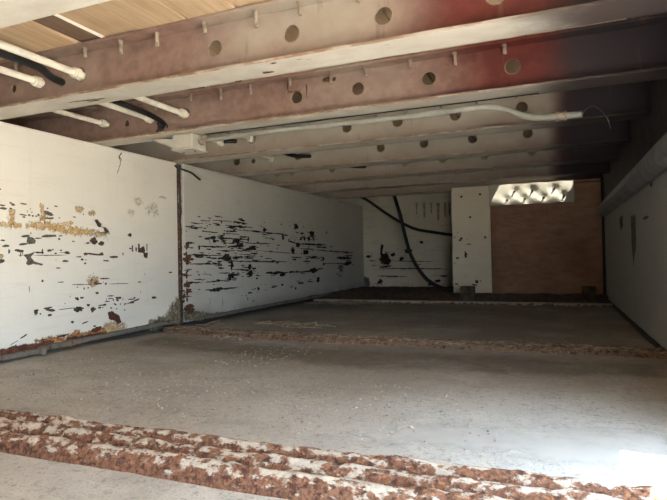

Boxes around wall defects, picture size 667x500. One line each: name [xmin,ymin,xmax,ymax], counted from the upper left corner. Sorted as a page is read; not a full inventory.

peeling [0,202,60,221]
peeling [86,220,109,246]
peeling [0,234,70,269]
peeling [300,231,333,282]
peeling [366,244,412,268]
peeling [73,295,125,324]
peeling [181,272,195,314]
rust [0,322,125,355]